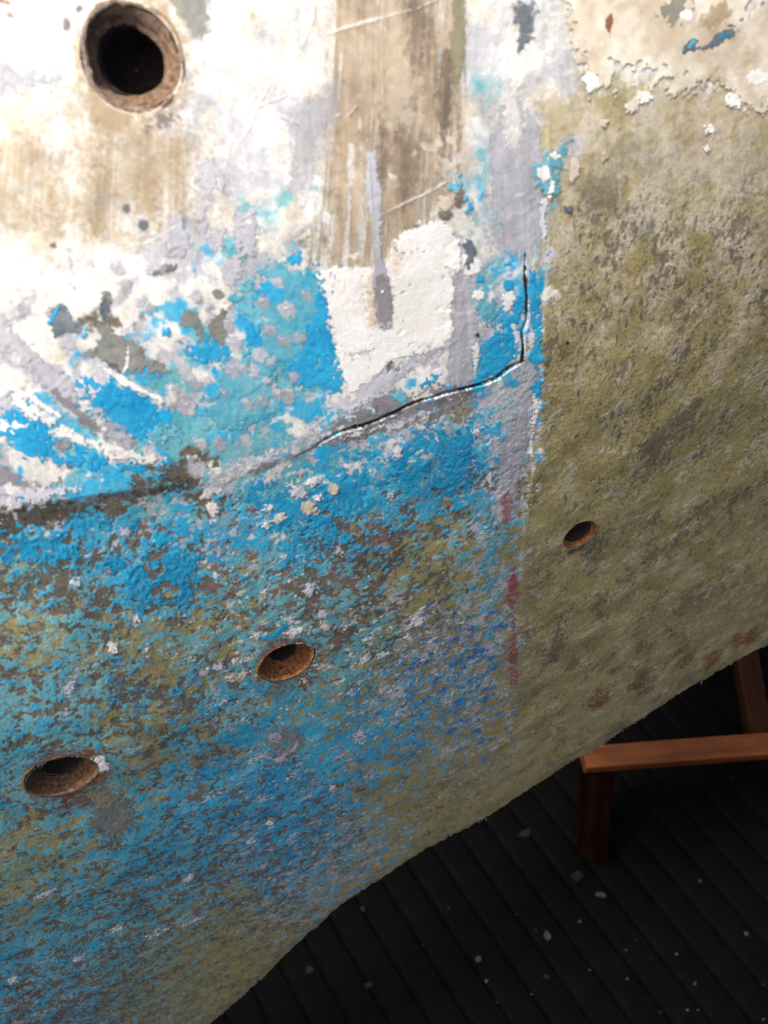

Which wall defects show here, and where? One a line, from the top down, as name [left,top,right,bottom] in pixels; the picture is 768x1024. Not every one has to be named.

peeling [511,0,539,53]
peeling [565,0,768,116]
peeling [702,122,715,154]
peeling [148,214,193,276]
peeling [47,291,184,448]
peeling [162,73,580,564]
crack [340,254,531,435]
peeling [0,407,215,613]
rust [561,520,599,555]
rust [256,642,315,682]
rust [21,743,111,811]